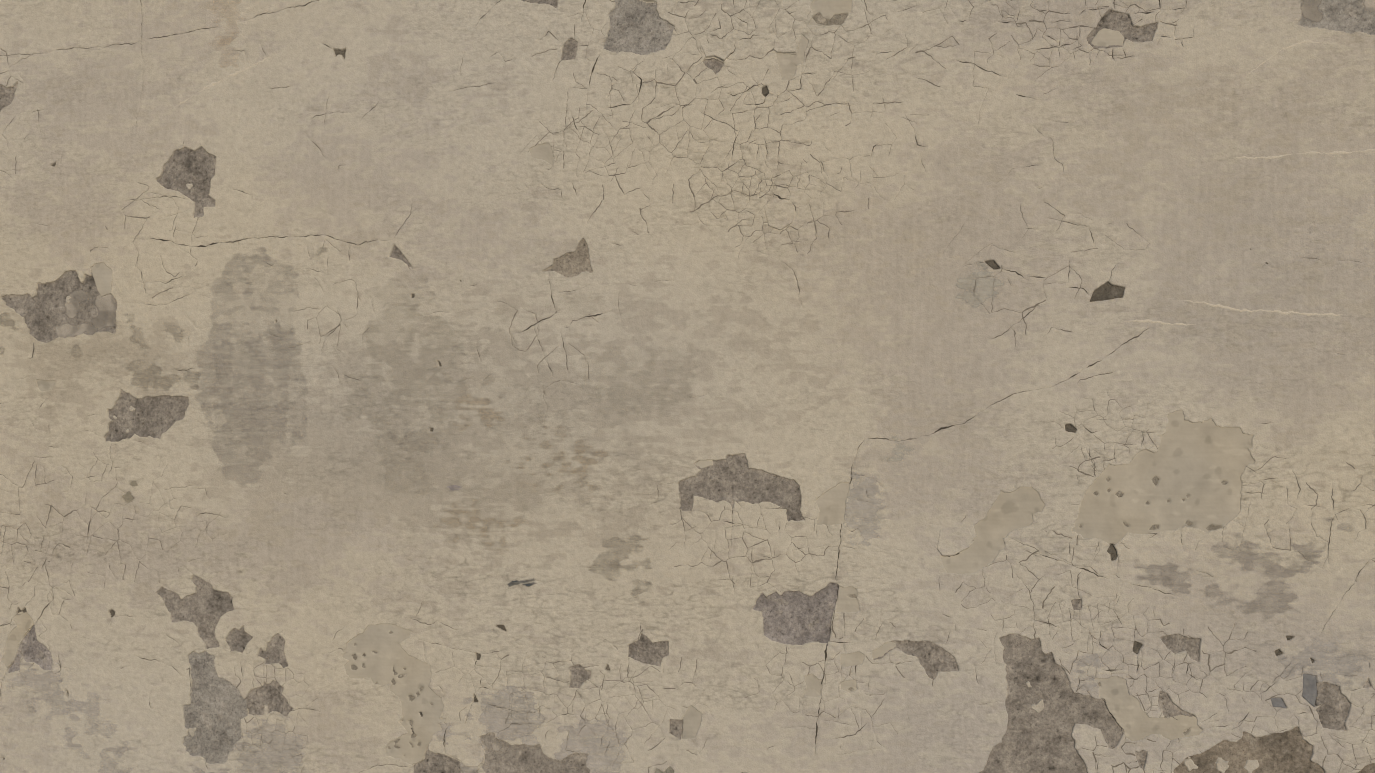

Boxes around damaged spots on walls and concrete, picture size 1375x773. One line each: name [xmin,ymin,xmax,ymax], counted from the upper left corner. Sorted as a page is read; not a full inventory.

peeling [157,147,216,218]
crack [457,0,1194,350]
peeling [2,262,117,343]
peeling [105,390,189,442]
crack [432,280,631,422]
crack [0,343,226,694]
peeling [157,575,293,764]
peeling [679,454,805,521]
peeling [753,583,860,646]
crack [649,329,1375,773]
peeling [979,634,1203,773]
peeling [1174,727,1325,773]